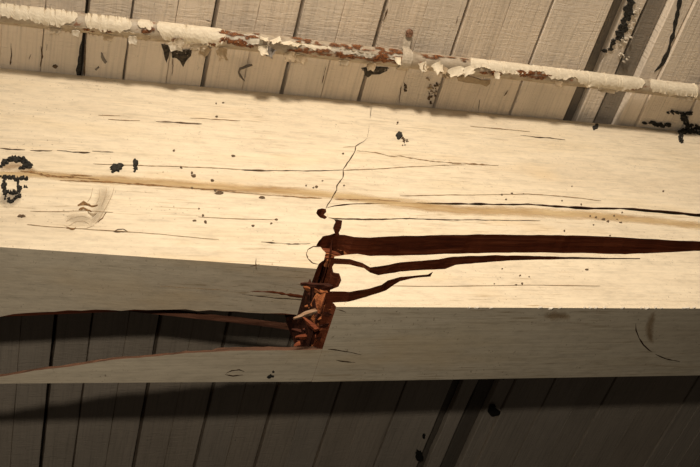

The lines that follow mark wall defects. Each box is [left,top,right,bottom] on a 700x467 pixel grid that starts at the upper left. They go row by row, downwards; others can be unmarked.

peeling [161,37,228,73]
rust [208,30,260,48]
peeling [258,35,307,65]
rust [288,37,403,64]
peeling [361,62,389,77]
peeling [418,61,500,104]
rust [517,70,552,80]
leakage [601,0,641,62]
leakage [0,158,700,228]
crack [27,210,219,240]
crack [170,140,700,363]